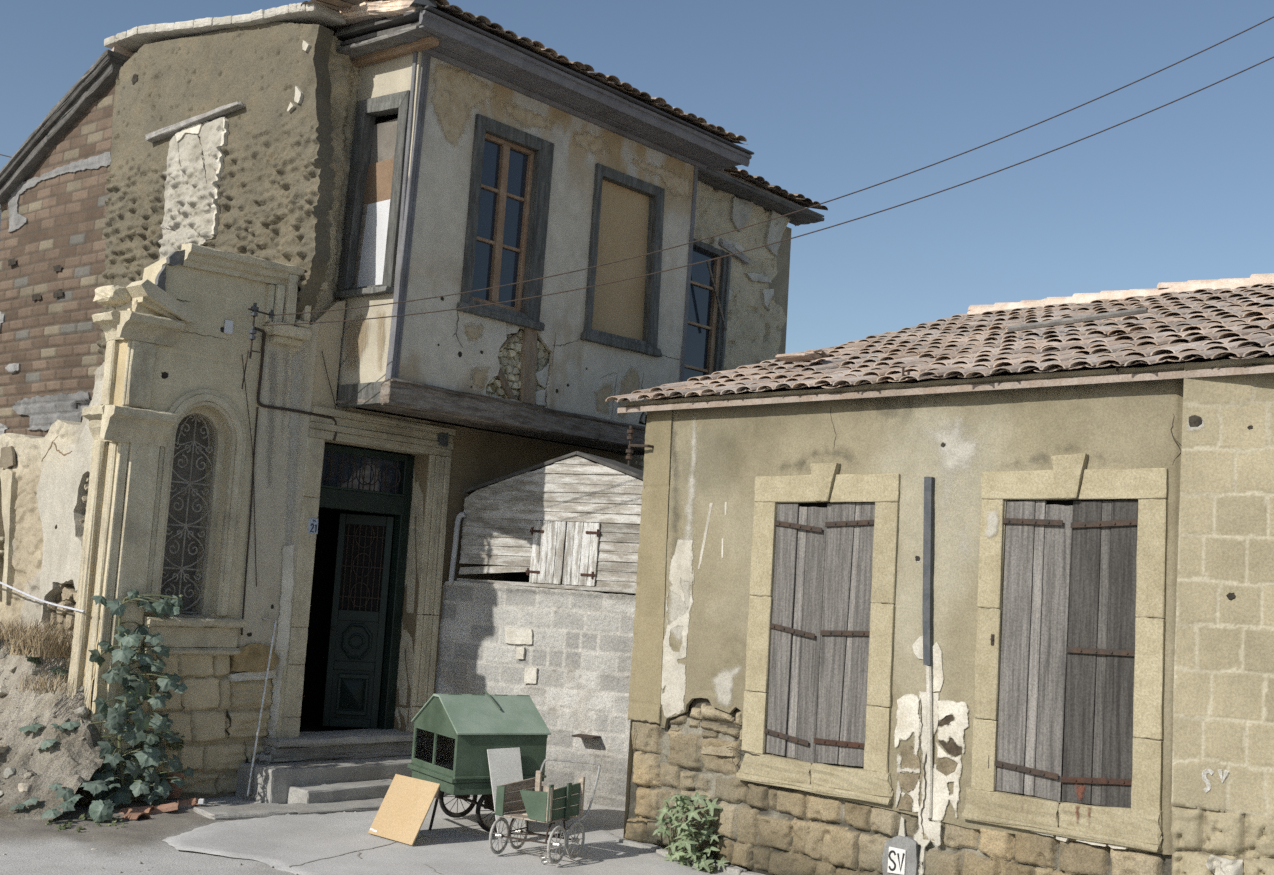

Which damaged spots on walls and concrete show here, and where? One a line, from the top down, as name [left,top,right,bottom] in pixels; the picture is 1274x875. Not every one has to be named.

flaking render [155,117,229,292]
flaking render [710,197,753,254]
flaking render [465,323,570,407]
peeling [661,539,742,756]
flaking render [894,636,969,875]